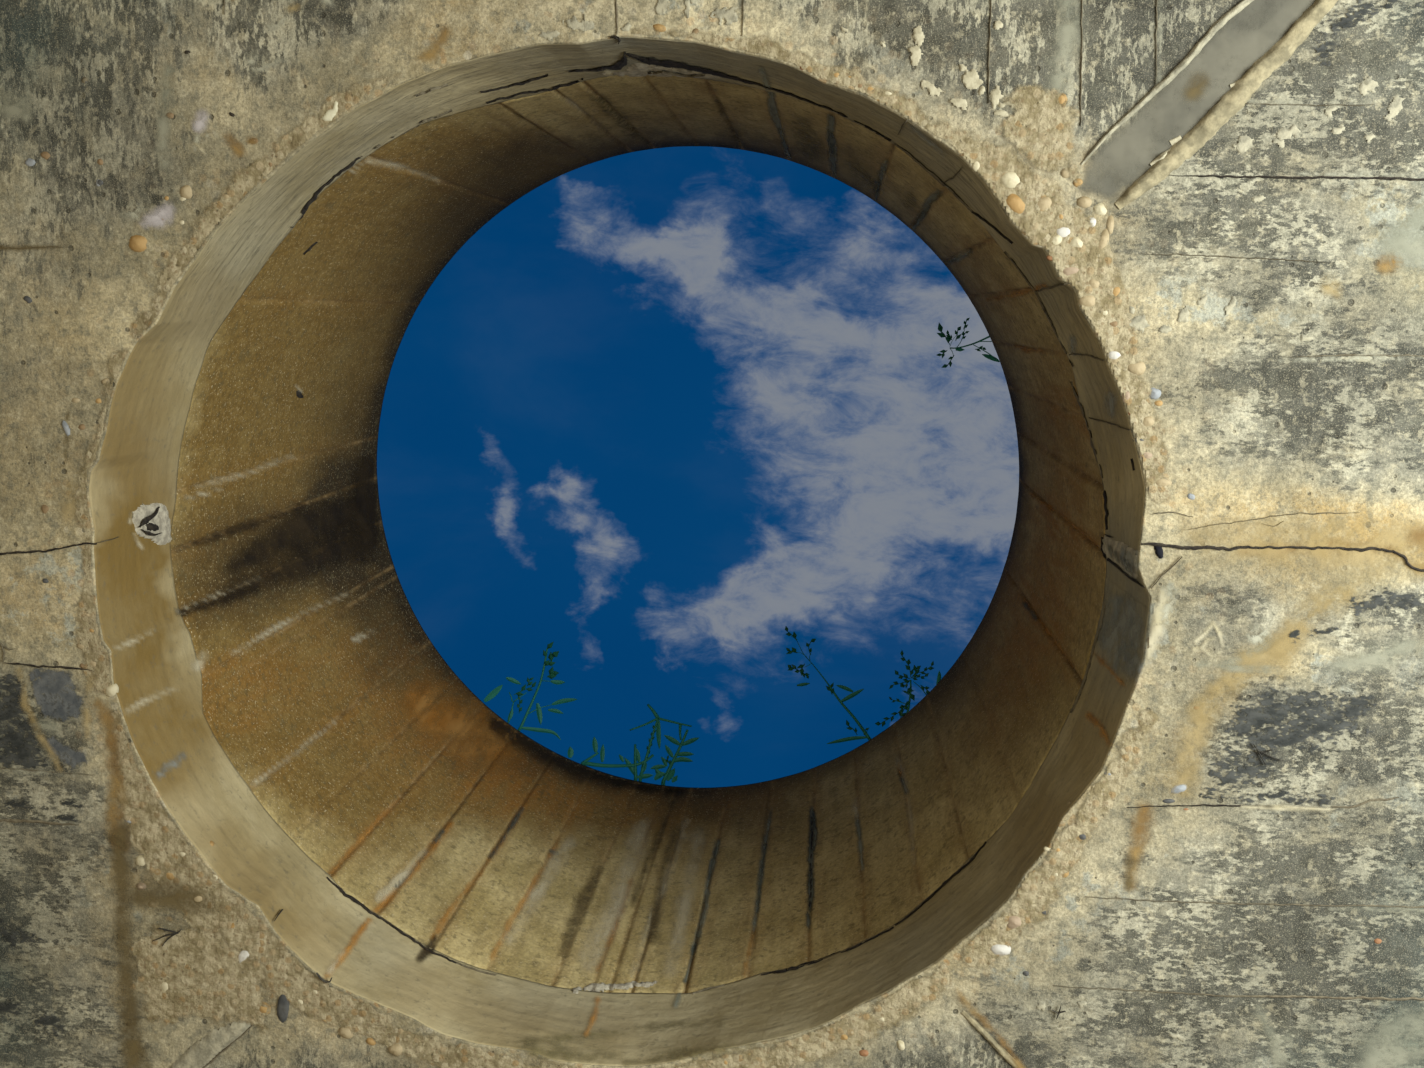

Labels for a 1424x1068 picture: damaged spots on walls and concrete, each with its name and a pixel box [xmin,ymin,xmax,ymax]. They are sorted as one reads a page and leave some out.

crack [290,0,1424,713]
crack [0,537,118,555]
water stain [180,459,377,615]
corrosion [336,822,452,966]
corrosion [479,798,529,876]
water stain [564,878,595,947]
water stain [596,822,677,942]